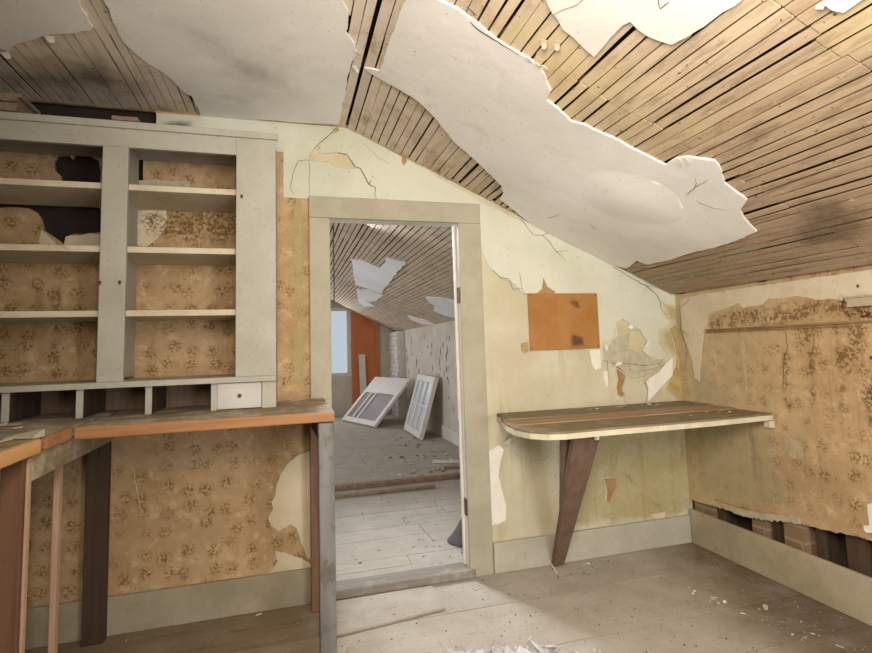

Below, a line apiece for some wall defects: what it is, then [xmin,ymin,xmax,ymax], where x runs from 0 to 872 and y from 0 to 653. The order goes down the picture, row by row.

spalling [0,0,200,124]
spalling [307,0,519,216]
spalling [0,204,101,244]
spalling [56,156,101,183]
crack [290,128,386,199]
spalling [444,0,872,402]
spalling [330,223,455,332]
peeling [489,435,513,525]
peeling [727,505,801,532]
spalling [838,532,848,568]